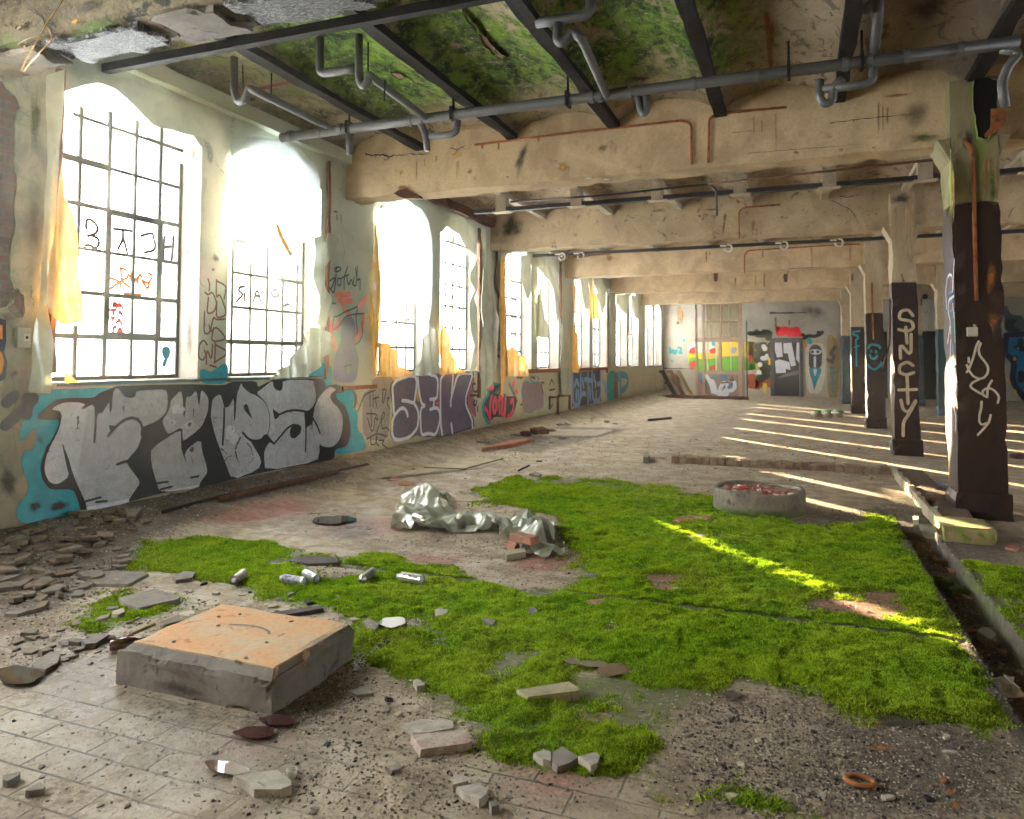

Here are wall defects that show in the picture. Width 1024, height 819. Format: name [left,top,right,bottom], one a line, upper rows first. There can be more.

peeling [460,9,508,64]
spalling [972,76,1007,142]
crack [365,145,466,160]
spalling [0,78,25,321]